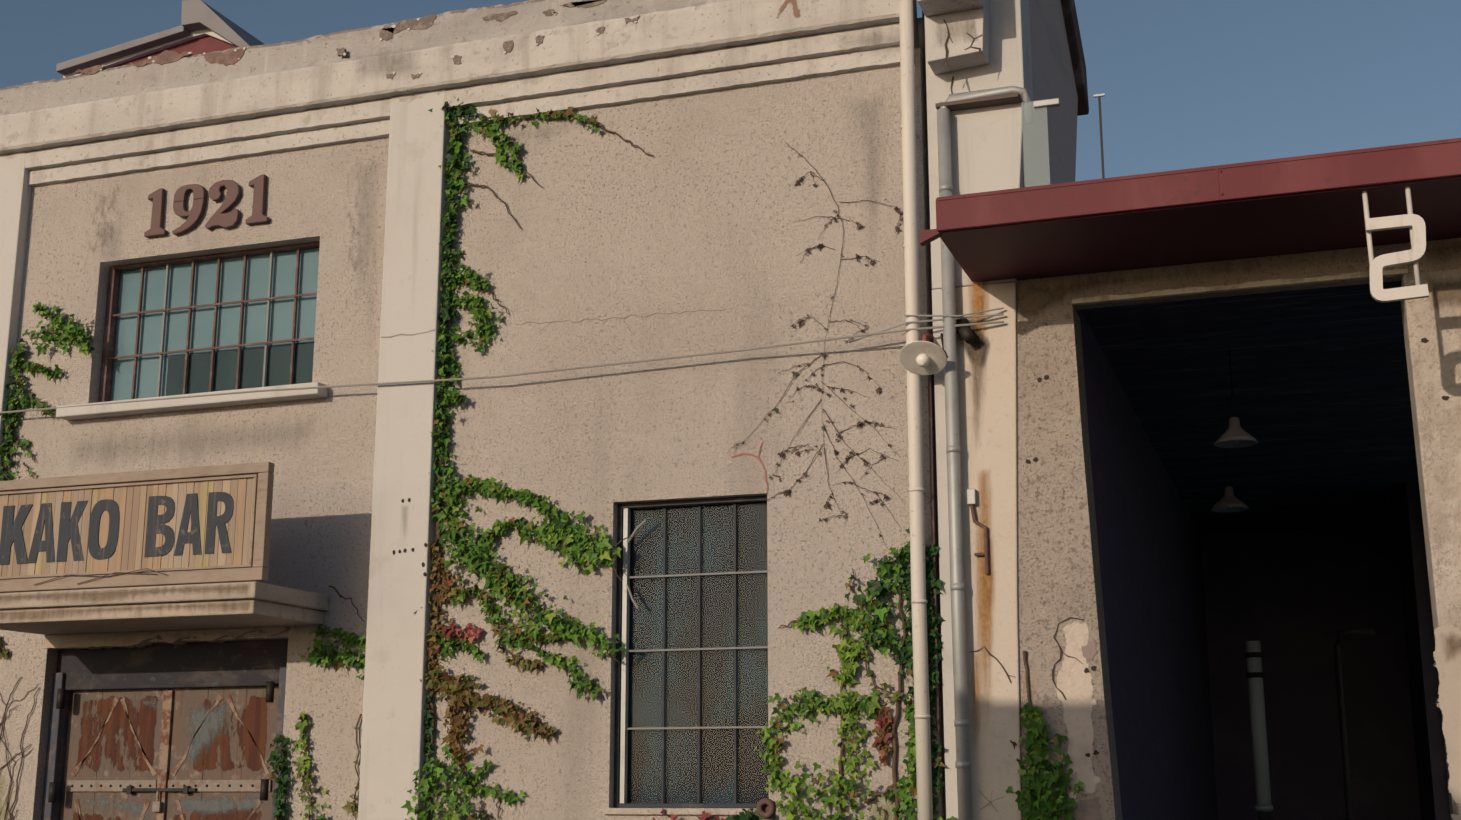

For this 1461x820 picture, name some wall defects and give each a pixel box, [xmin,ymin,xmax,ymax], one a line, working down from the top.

spalling [483,11,518,21]
spalling [542,0,607,16]
spalling [379,14,437,41]
spalling [129,47,246,67]
spalling [502,40,514,54]
spalling [75,65,105,75]
corrosion [978,475,991,668]
peeling [1056,620,1103,820]
peeling [1433,603,1461,820]